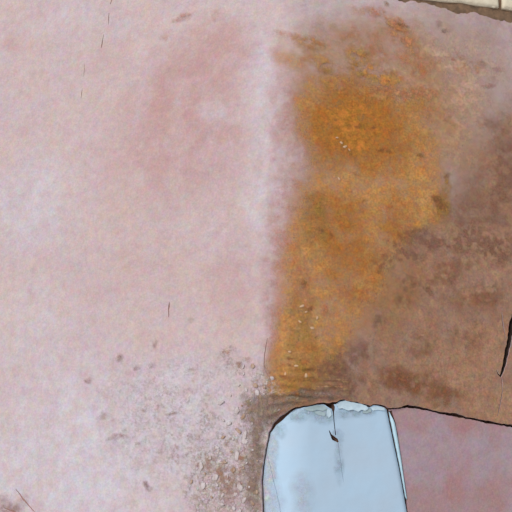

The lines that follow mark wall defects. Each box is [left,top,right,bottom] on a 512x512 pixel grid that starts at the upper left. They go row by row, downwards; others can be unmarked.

rust [270,18,499,396]
flaking render [185,364,385,512]
crack [262,317,512,512]